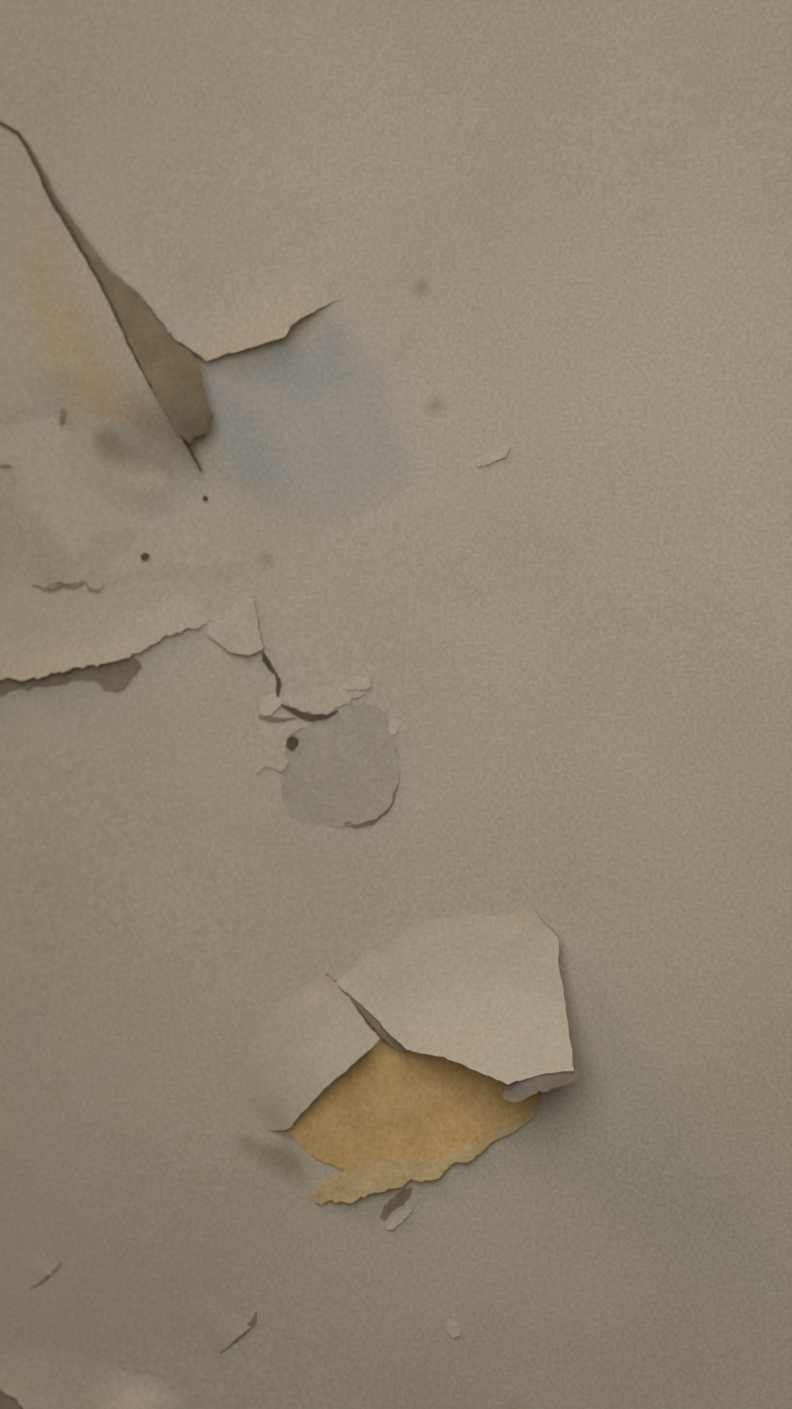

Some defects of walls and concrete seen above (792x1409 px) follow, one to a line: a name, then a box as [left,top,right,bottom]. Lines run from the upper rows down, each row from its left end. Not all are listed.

peeling [0,121,420,524]
peeling [0,589,264,695]
peeling [253,676,400,828]
peeling [239,908,583,1230]
peeling [0,1345,191,1409]